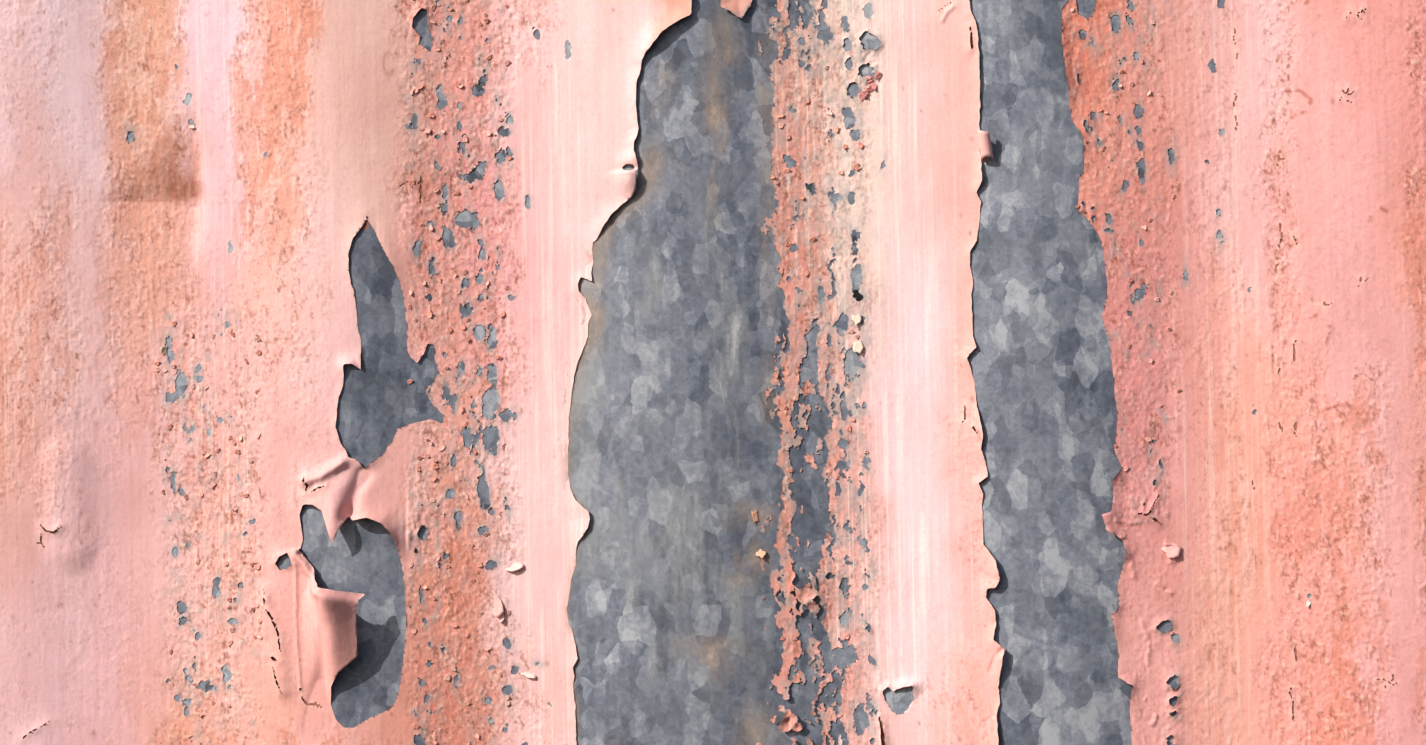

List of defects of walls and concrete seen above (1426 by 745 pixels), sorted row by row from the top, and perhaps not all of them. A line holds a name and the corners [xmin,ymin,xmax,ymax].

peeling [564,39,572,59]
peeling [161,364,445,745]
peeling [336,0,524,583]
peeling [444,595,539,745]
peeling [567,0,922,745]
peeling [967,0,1151,745]
peeling [1161,543,1181,558]
peeling [1166,675,1179,716]